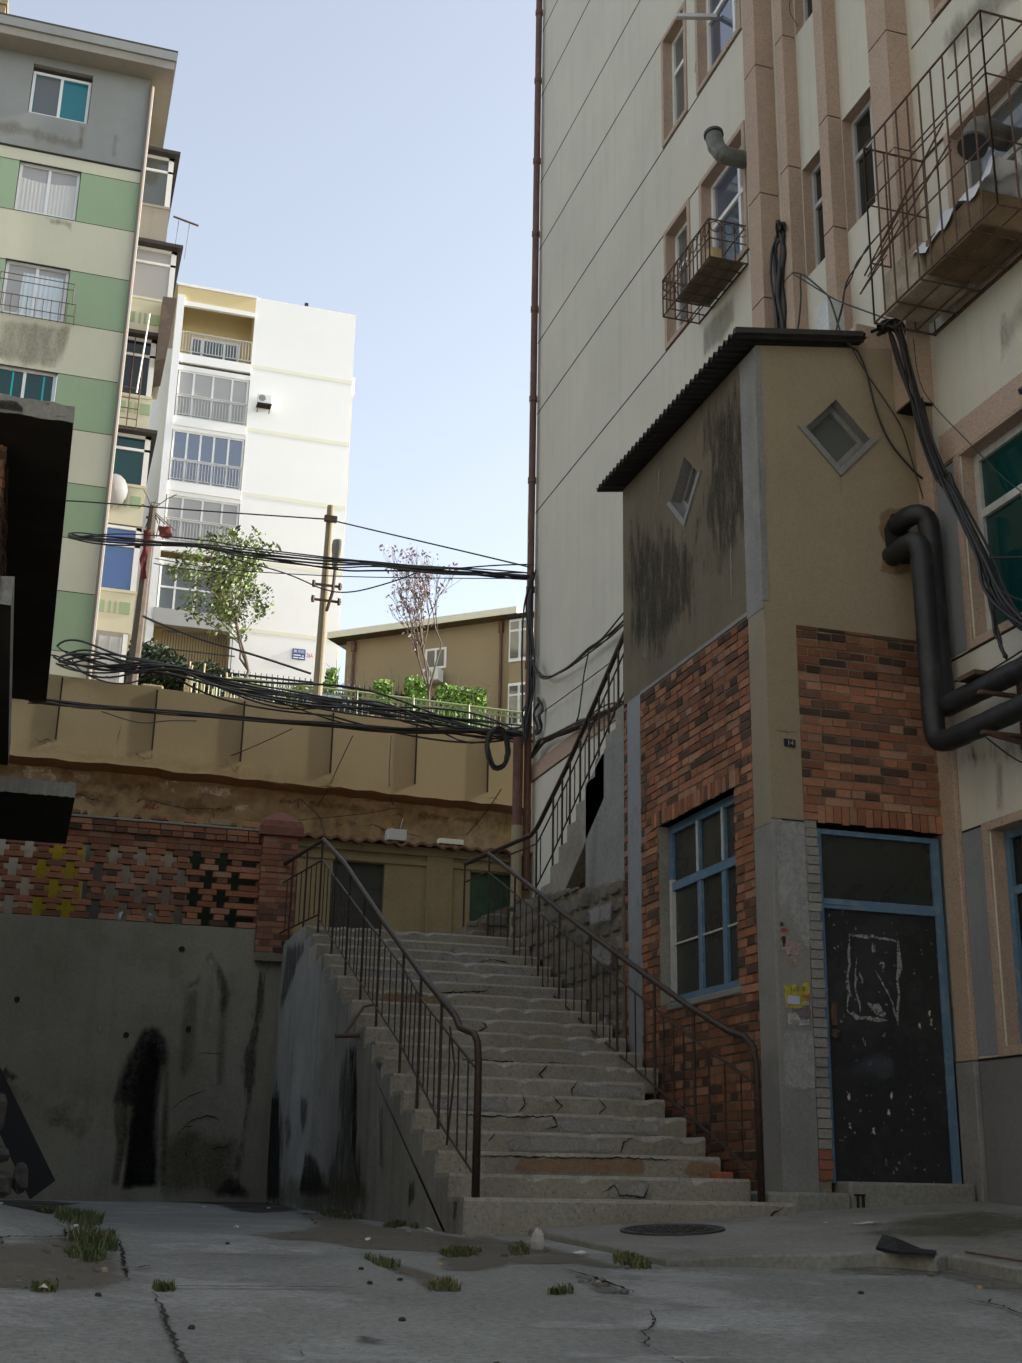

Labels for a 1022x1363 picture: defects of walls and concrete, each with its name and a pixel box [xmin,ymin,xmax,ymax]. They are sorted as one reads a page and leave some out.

damp [631,533,690,649]
damp [244,976,264,1101]
damp [113,1029,167,1188]
damp [266,1049,365,1212]
crack [567,1269,683,1363]